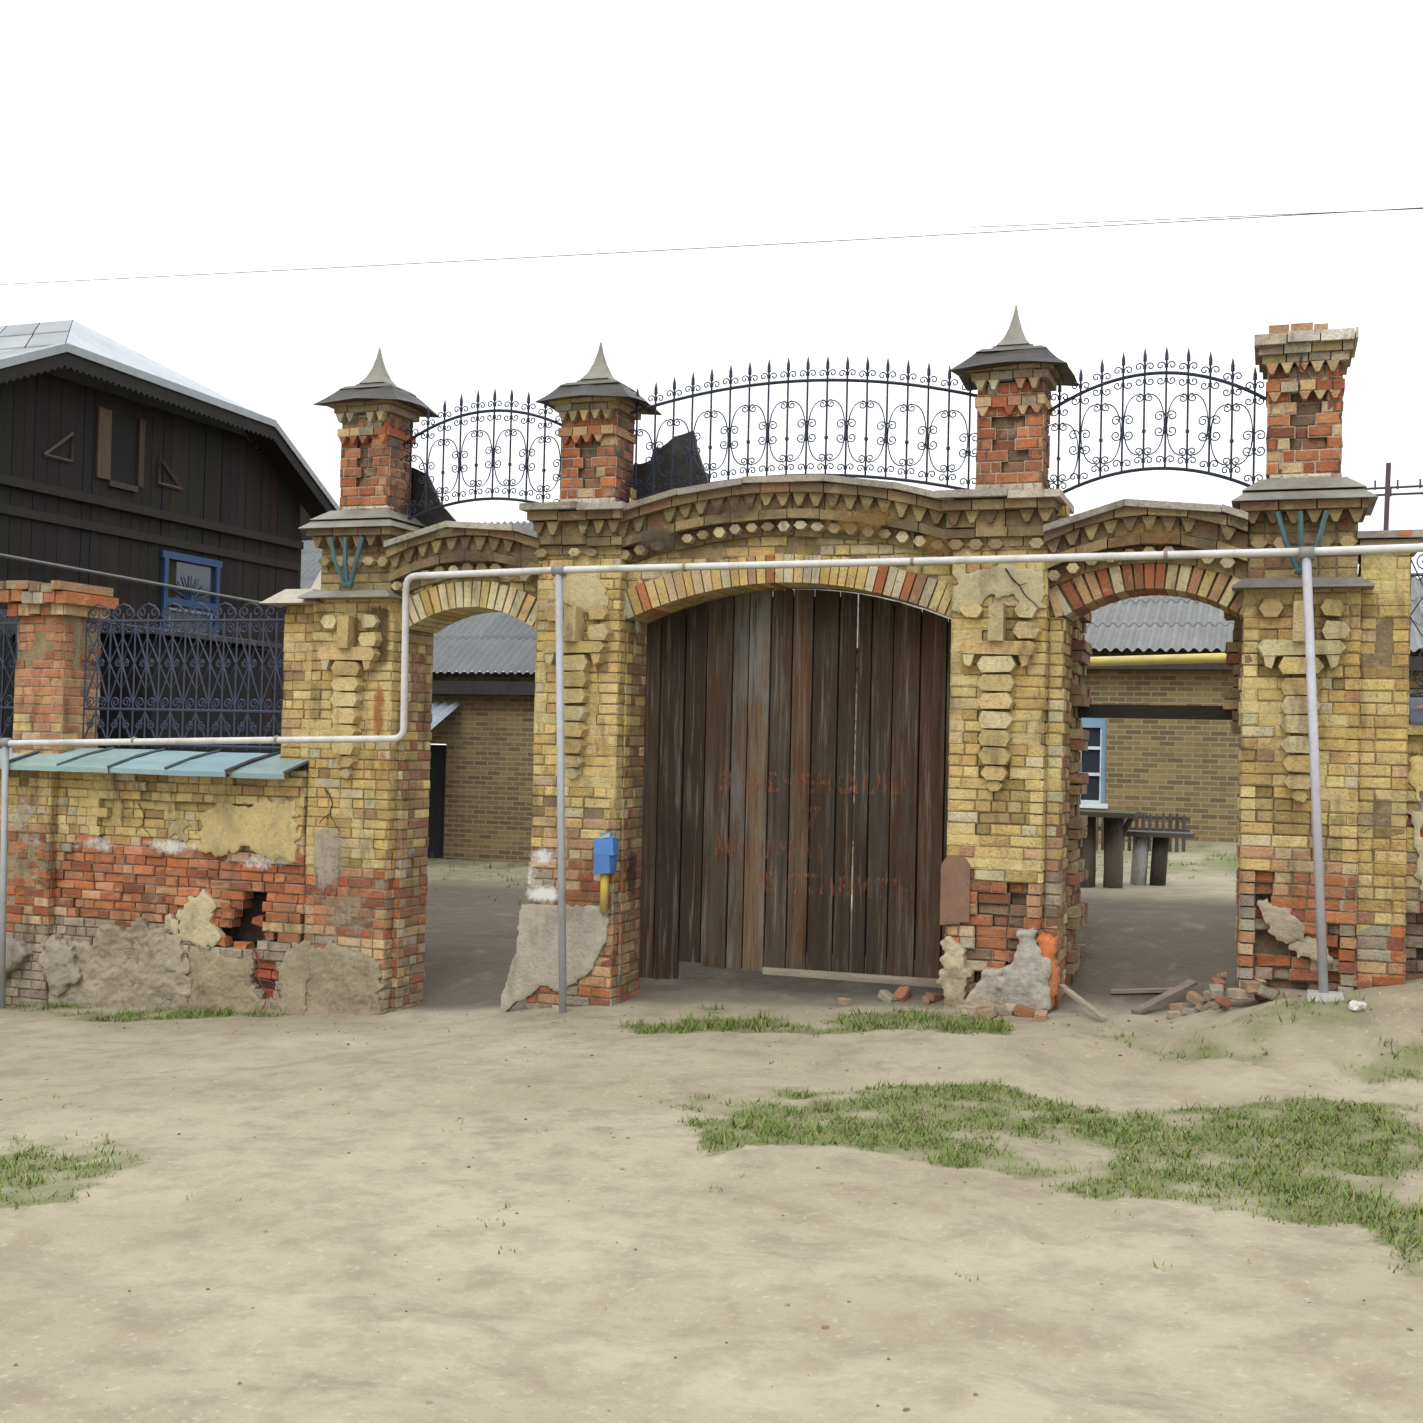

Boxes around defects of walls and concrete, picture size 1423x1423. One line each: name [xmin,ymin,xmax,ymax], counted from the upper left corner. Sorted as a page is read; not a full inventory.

peeling [1407,754,1423,892]
spalling [0,799,313,1014]
spalling [878,871,1060,1022]
spalling [1166,870,1373,1020]